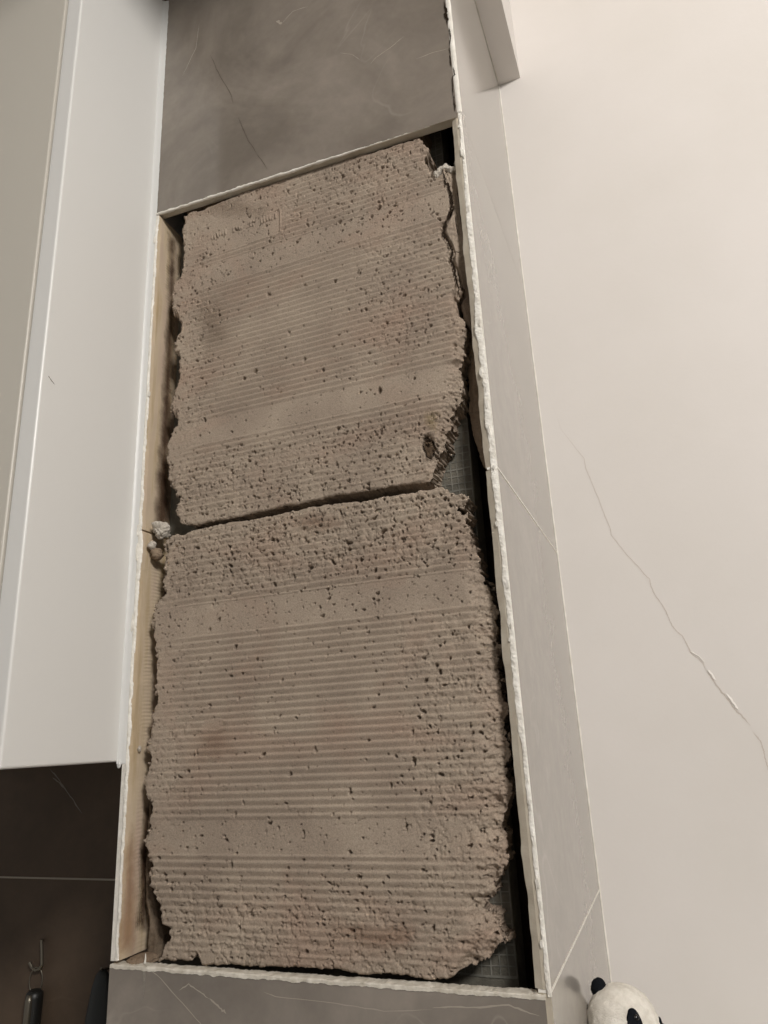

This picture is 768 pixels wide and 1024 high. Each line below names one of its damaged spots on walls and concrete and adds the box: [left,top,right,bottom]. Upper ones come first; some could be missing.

spalling [423,433,436,461]
spalling [458,112,552,997]
crack [559,424,768,767]